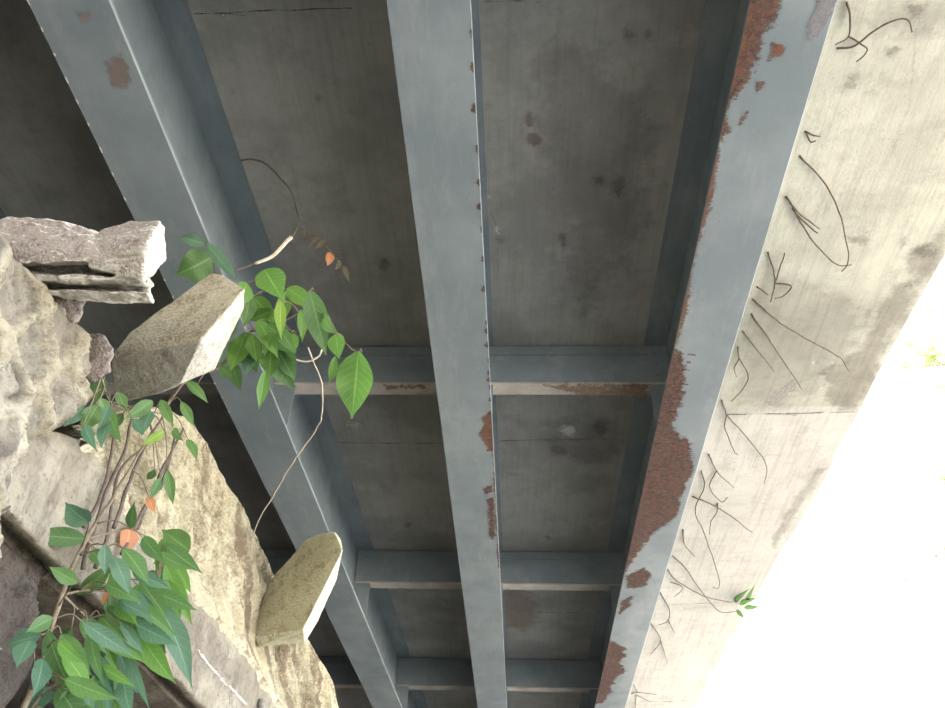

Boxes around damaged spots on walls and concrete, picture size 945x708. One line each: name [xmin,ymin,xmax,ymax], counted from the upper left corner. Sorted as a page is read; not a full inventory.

peeling [807,0,836,42]
corrosion [108,58,129,86]
corrosion [618,0,785,614]
corrosion [479,320,499,567]
crack [727,410,848,418]
corrosion [596,642,627,704]